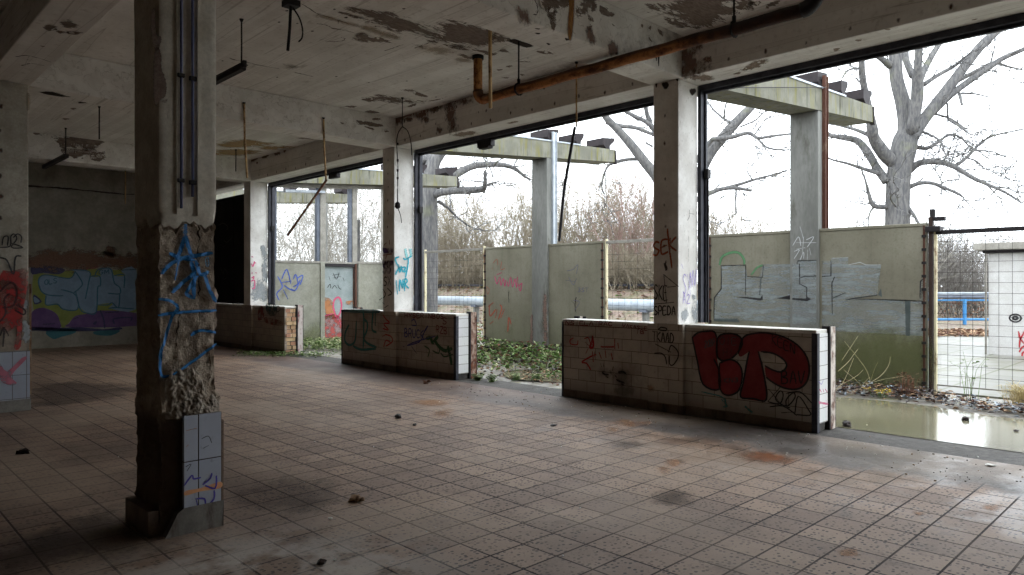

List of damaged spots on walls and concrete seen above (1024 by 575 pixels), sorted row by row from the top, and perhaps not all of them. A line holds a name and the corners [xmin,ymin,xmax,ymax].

damp [516,6,530,24]
peeling [641,0,780,42]
spalling [28,222,221,536]